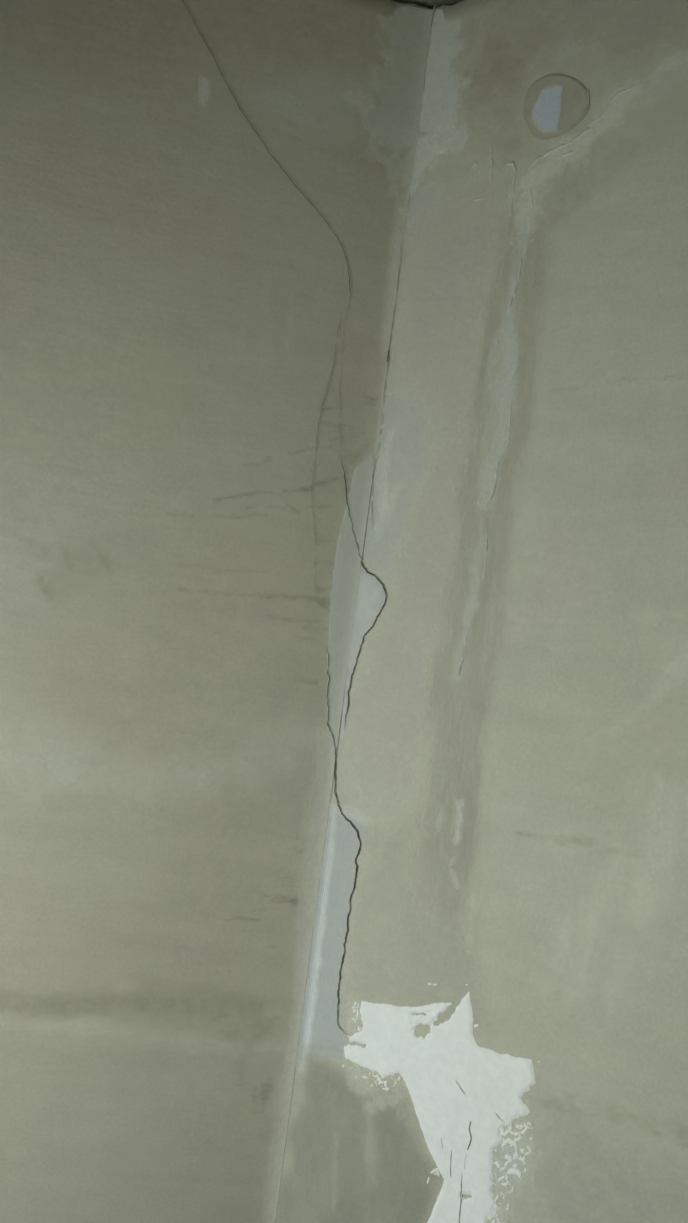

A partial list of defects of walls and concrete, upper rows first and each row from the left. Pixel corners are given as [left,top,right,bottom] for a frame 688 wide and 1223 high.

crack [182,0,401,1035]
peeling [492,1121,533,1223]